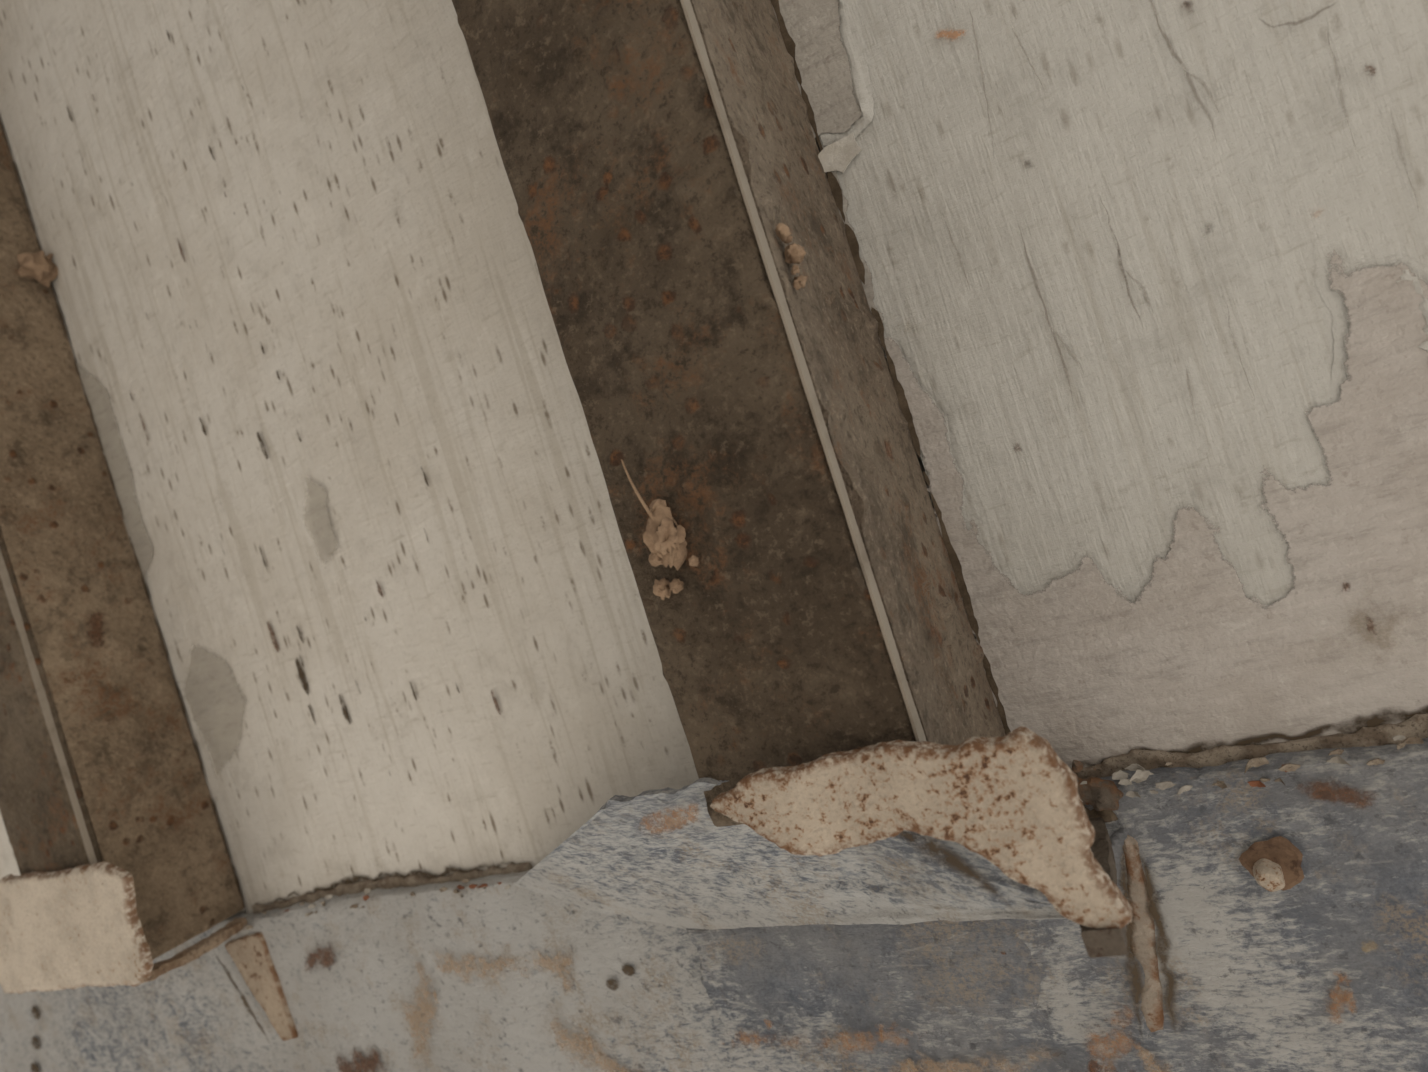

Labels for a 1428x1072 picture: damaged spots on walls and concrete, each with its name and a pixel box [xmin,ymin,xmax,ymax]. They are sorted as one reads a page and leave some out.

peeling [773,0,874,238]
peeling [860,258,884,321]
peeling [879,236,1428,768]
crack [1069,707,1428,805]
corrosion [336,1049,386,1072]